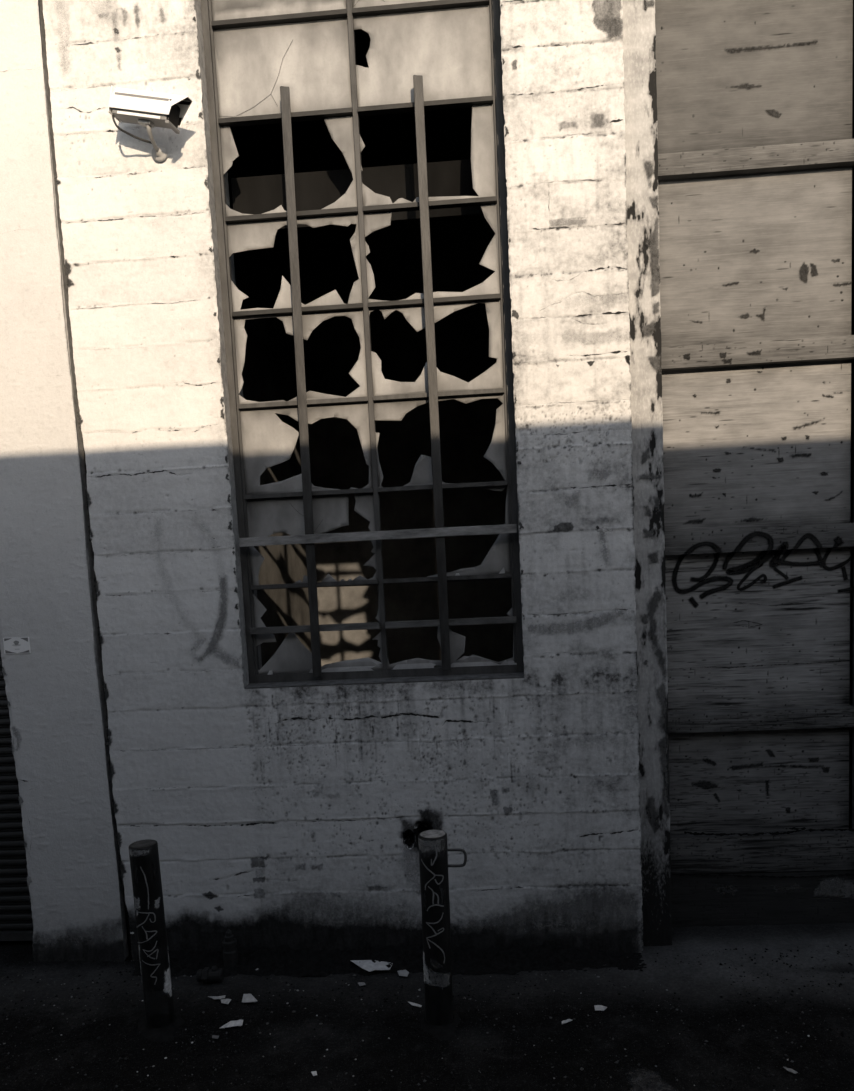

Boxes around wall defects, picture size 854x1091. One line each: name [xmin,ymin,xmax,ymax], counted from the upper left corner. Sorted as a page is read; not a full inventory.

peeling [643,161,660,336]
peeling [649,356,661,370]
crack [120,713,508,751]
peeling [641,587,669,833]
spalling [402,821,433,850]
damp [251,856,269,898]
damp [166,894,423,952]
damp [451,889,642,953]